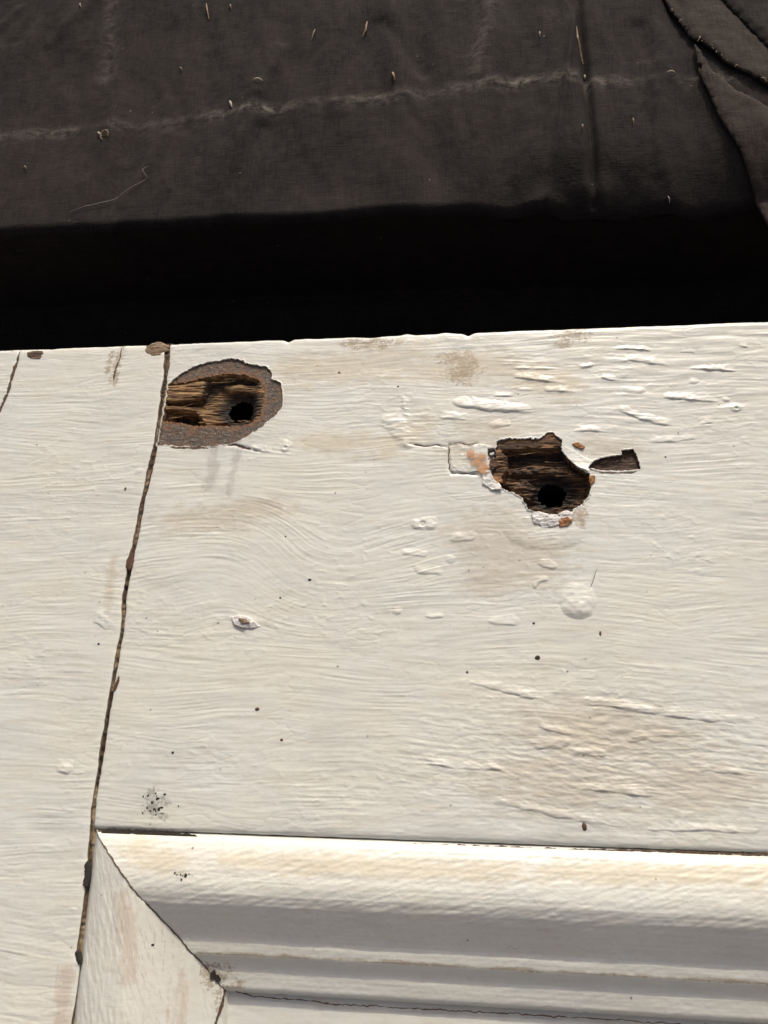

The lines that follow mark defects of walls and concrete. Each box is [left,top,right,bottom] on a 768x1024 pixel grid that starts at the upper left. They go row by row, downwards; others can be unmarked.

peeling [155,357,284,448]
peeling [450,431,642,527]